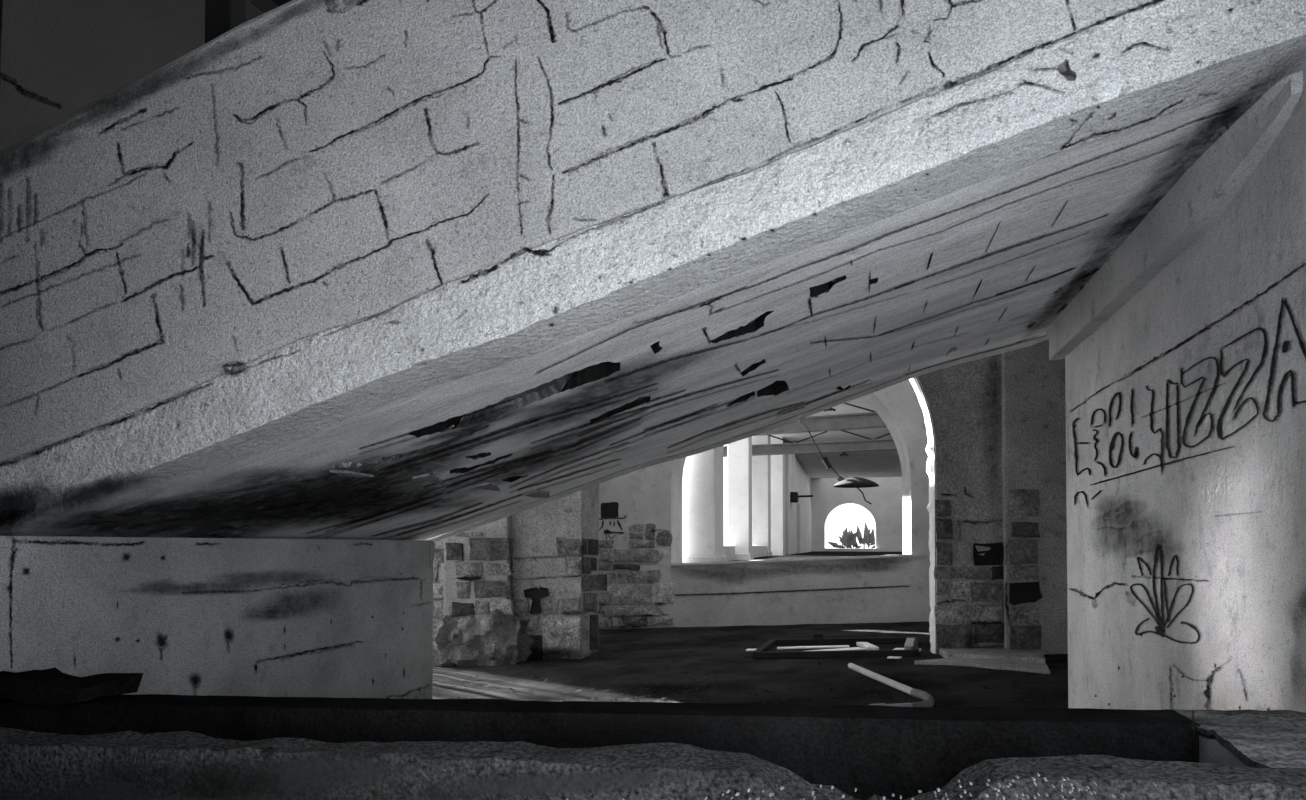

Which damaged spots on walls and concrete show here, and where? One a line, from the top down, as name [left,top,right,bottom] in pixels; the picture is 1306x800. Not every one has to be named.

spalling [325,0,369,14]
crack [0,0,1209,377]
spalling [809,275,847,298]
spalling [710,311,773,343]
crack [1066,263,1306,417]
spalling [740,359,766,376]
spalling [329,361,620,477]
leakage [529,360,687,427]
spalling [590,396,651,423]
spalling [726,381,789,407]
leakage [0,412,511,538]
spalling [413,452,550,498]